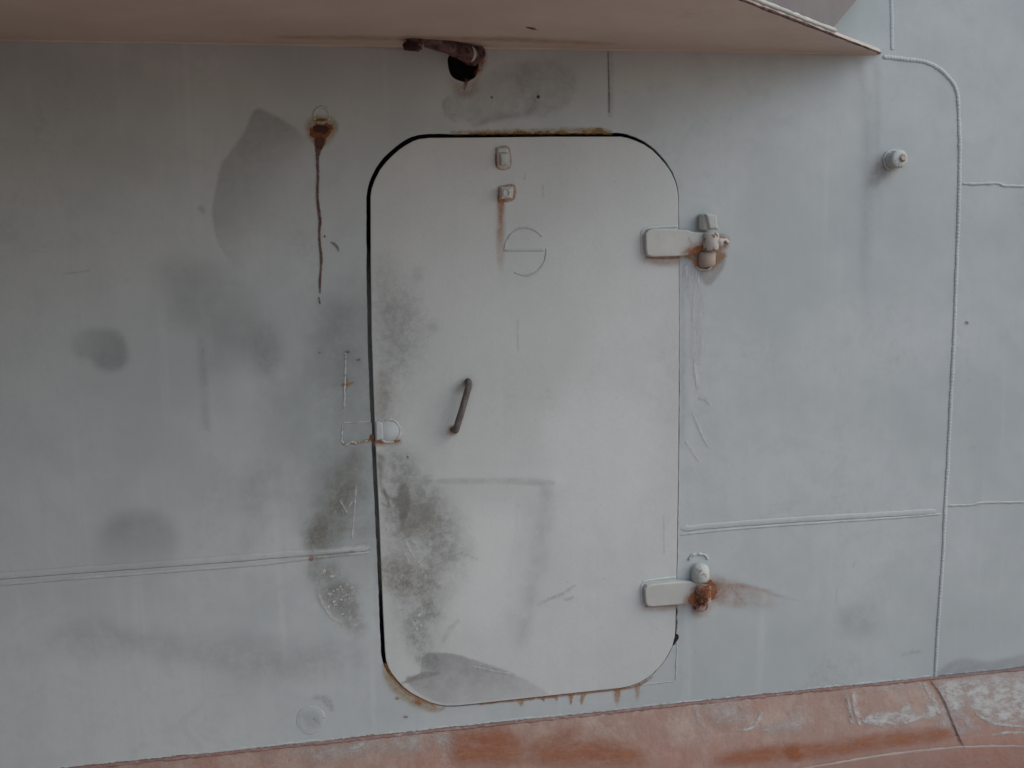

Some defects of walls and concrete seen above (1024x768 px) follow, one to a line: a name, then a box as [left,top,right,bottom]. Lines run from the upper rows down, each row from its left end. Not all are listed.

corrosion [458,128,609,170]
corrosion [309,118,334,303]
corrosion [498,184,516,219]
corrosion [647,238,726,269]
corrosion [687,579,718,605]
corrosion [480,680,648,705]